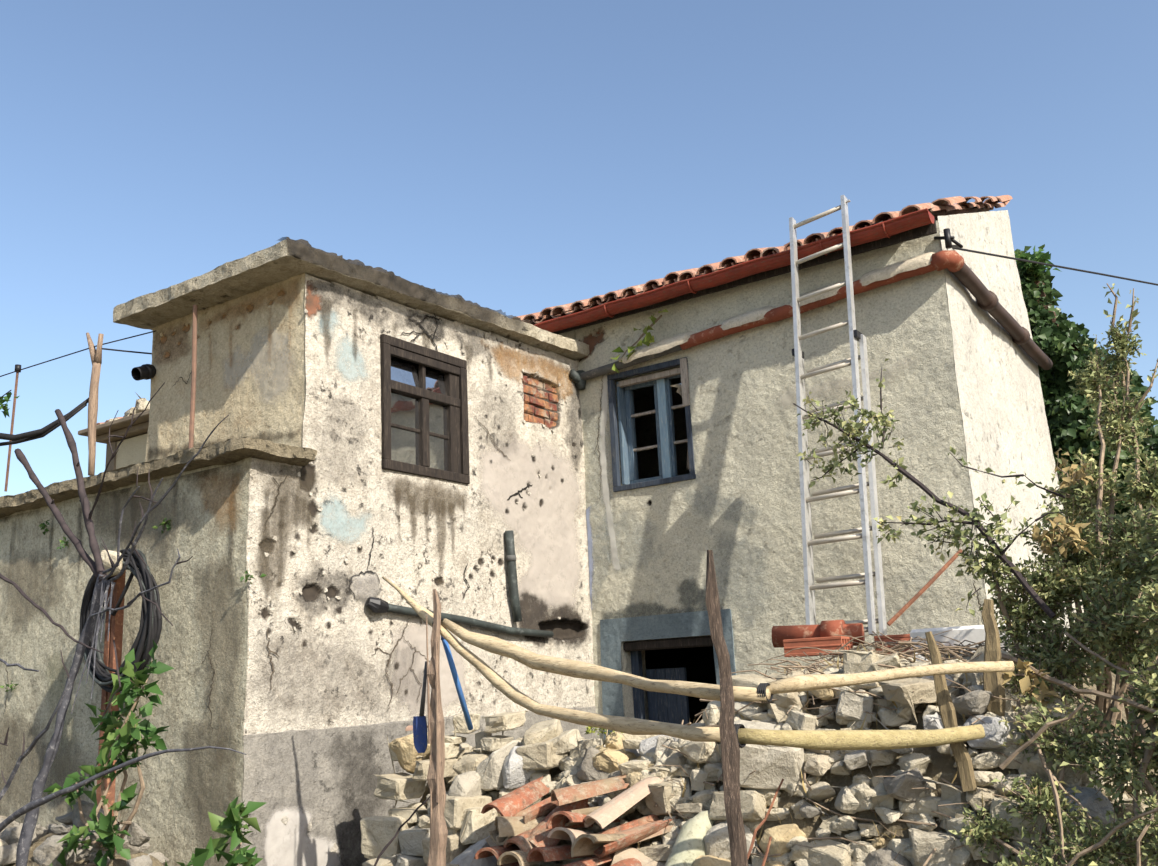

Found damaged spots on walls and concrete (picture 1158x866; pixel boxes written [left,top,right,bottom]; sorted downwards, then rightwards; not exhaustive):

flaking render [521,369,564,432]
water stain [394,479,464,581]
spalling [288,618,307,646]
spalling [299,568,342,628]
water stain [186,549,238,850]
water stain [0,719,87,817]
water stain [337,740,380,866]